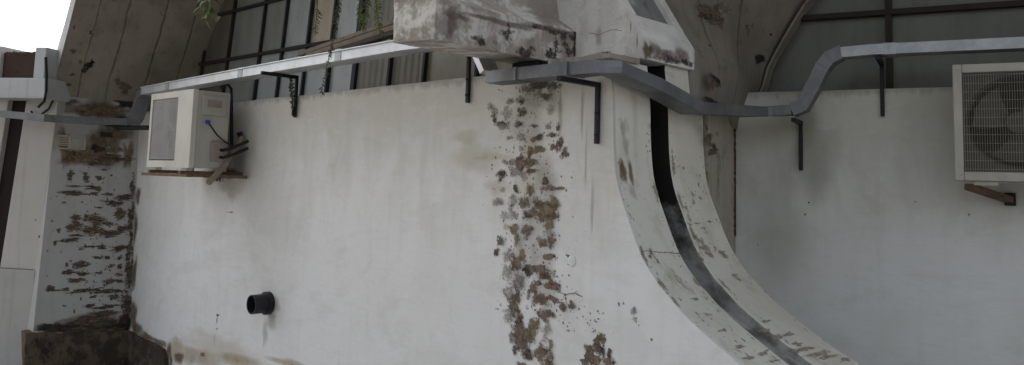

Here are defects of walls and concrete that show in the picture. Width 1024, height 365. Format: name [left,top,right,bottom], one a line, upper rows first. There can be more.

peeling [43,153,136,332]
peeling [488,81,615,365]
spalling [639,234,726,337]
peeling [678,124,733,263]
peeling [737,317,849,362]